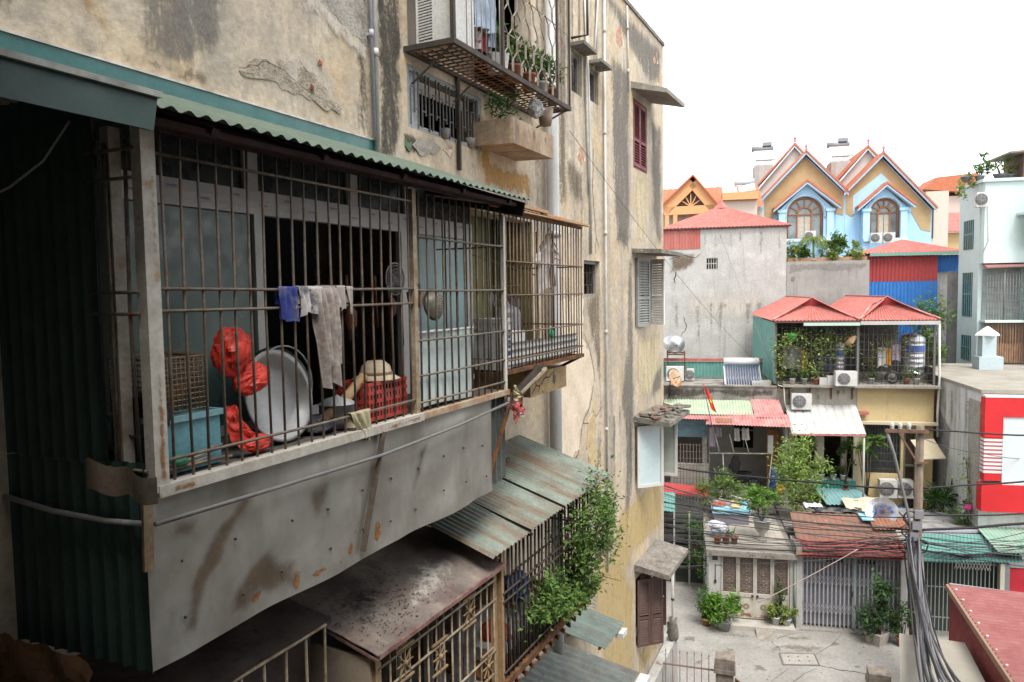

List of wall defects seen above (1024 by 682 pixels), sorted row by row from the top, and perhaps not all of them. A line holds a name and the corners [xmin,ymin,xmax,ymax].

water stain [144,0,217,80]
spalling [239,54,342,114]
water stain [378,0,400,155]
rust [159,393,167,478]
water stain [191,499,248,625]
water stain [238,556,291,606]